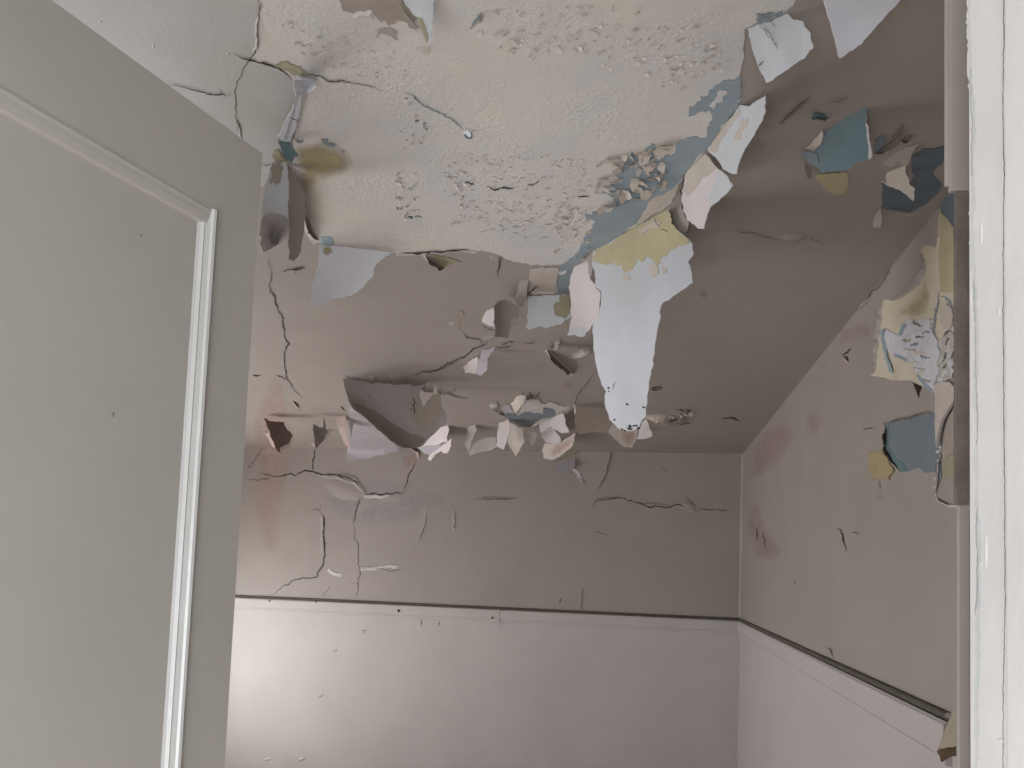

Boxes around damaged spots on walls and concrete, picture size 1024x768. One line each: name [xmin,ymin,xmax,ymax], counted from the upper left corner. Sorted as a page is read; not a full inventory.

crack [171,0,467,138]
peeling [823,0,900,58]
crack [252,262,306,396]
peeling [251,0,814,462]
peeling [779,98,955,496]
crack [247,448,414,599]
crack [571,468,727,515]